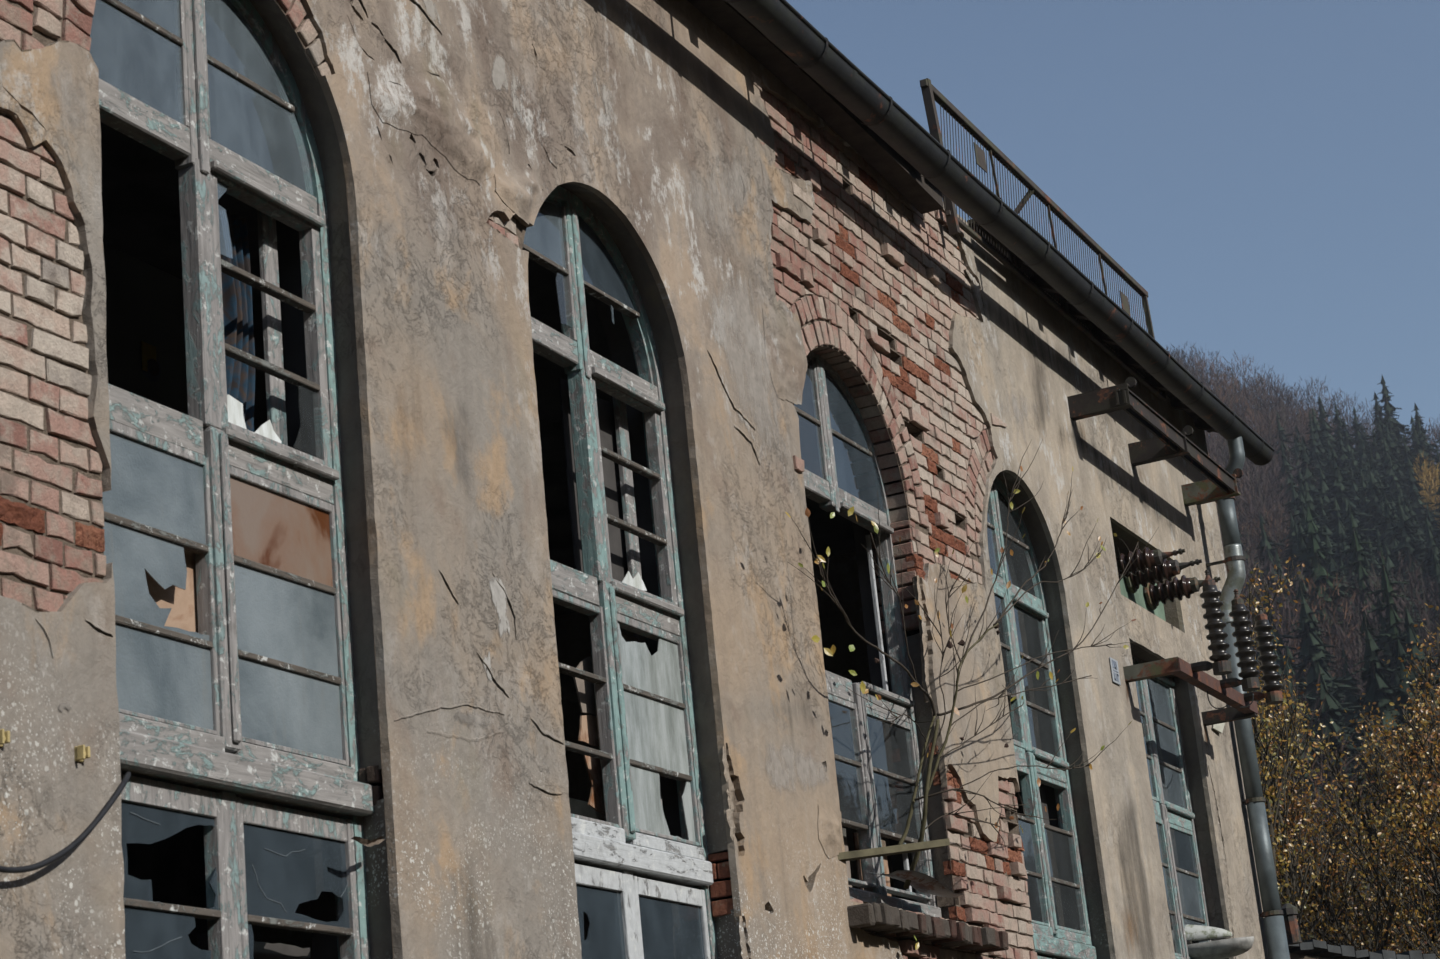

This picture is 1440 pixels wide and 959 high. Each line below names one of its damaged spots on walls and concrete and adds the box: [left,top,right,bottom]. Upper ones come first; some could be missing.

spalling [0,0,96,52]
spalling [277,0,335,78]
crack [491,112,544,213]
spalling [0,106,106,658]
spalling [750,71,1007,586]
spalling [863,743,1037,959]